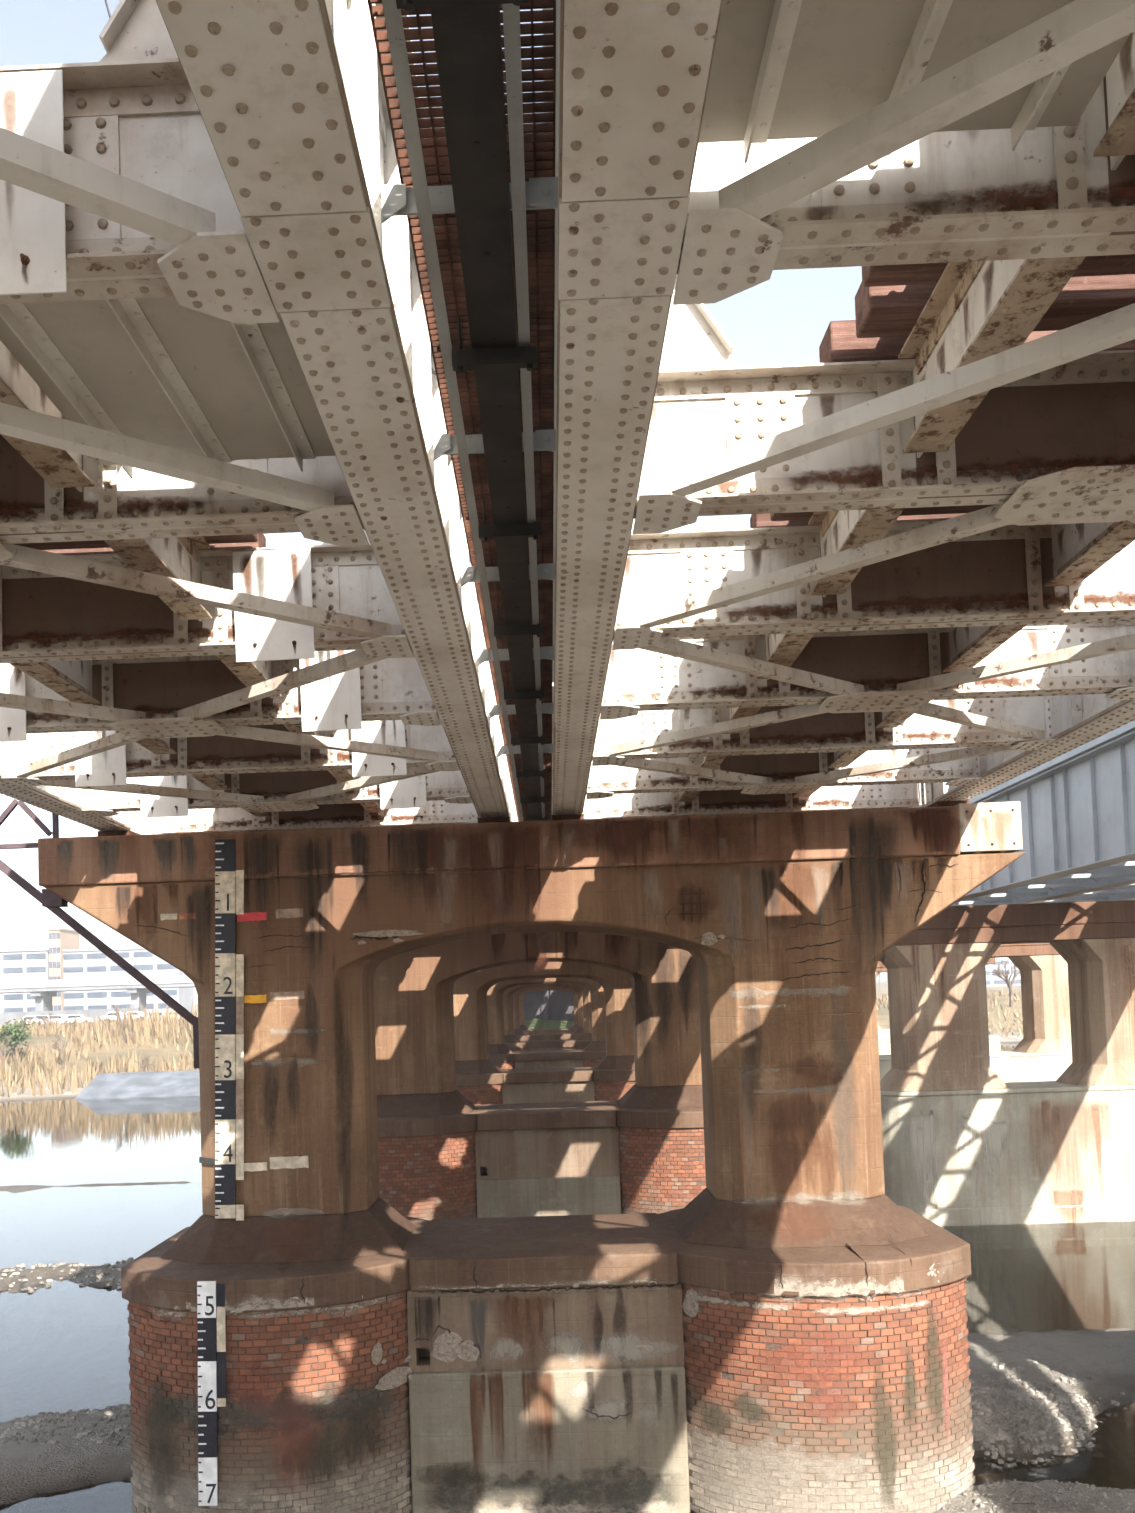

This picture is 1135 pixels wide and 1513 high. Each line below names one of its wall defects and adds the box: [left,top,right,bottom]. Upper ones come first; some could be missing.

leakage [3,89,16,132]
rust [919,180,1059,215]
rust [1087,180,1135,207]
rust [729,590,1135,642]
rust [113,751,367,782]
rust [191,787,422,828]
rust [558,798,849,916]
spalling [682,1288,699,1318]
spalling [364,1325,481,1399]
leakage [217,1373,392,1436]
leakage [415,1272,936,1513]
leakage [148,1385,295,1513]